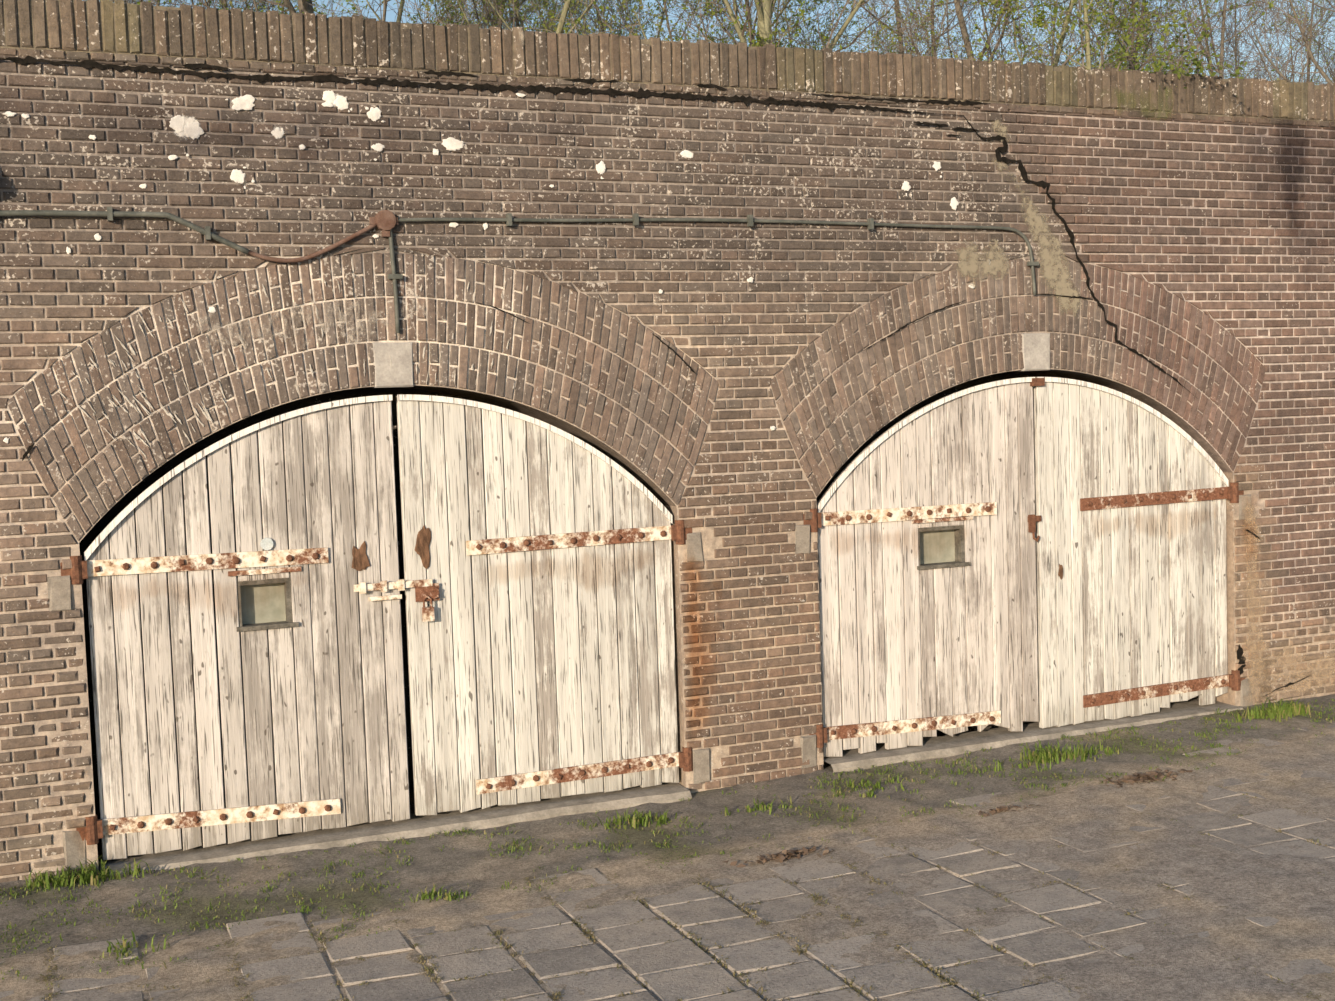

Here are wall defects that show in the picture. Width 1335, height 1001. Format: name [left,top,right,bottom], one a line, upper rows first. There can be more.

crack [0,55,1197,398]
crack [22,444,34,461]